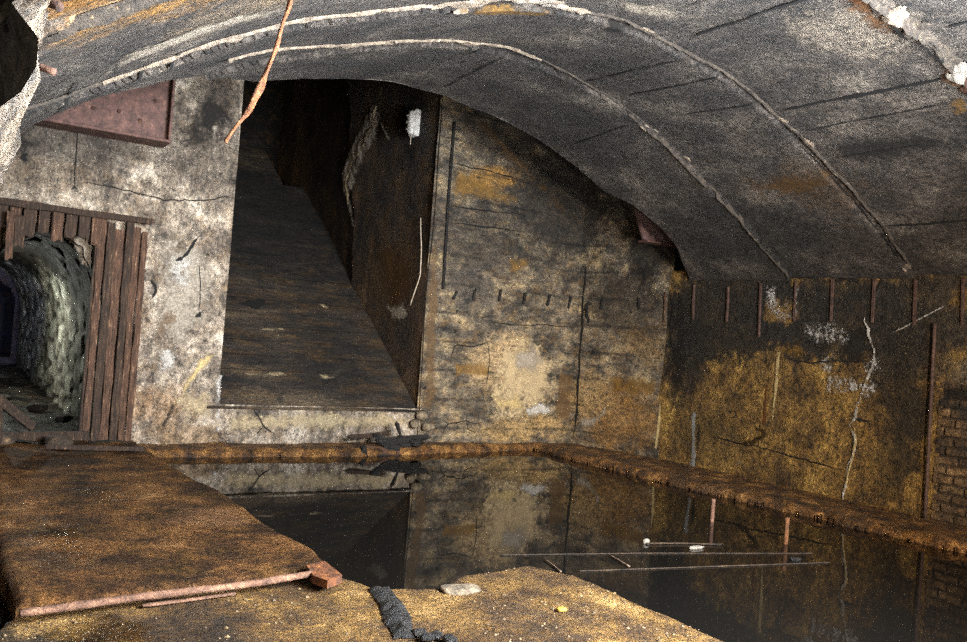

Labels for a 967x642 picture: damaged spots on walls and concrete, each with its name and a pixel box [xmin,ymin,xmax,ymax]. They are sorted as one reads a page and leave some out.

peeling [870,0,931,40]
peeling [944,61,967,94]